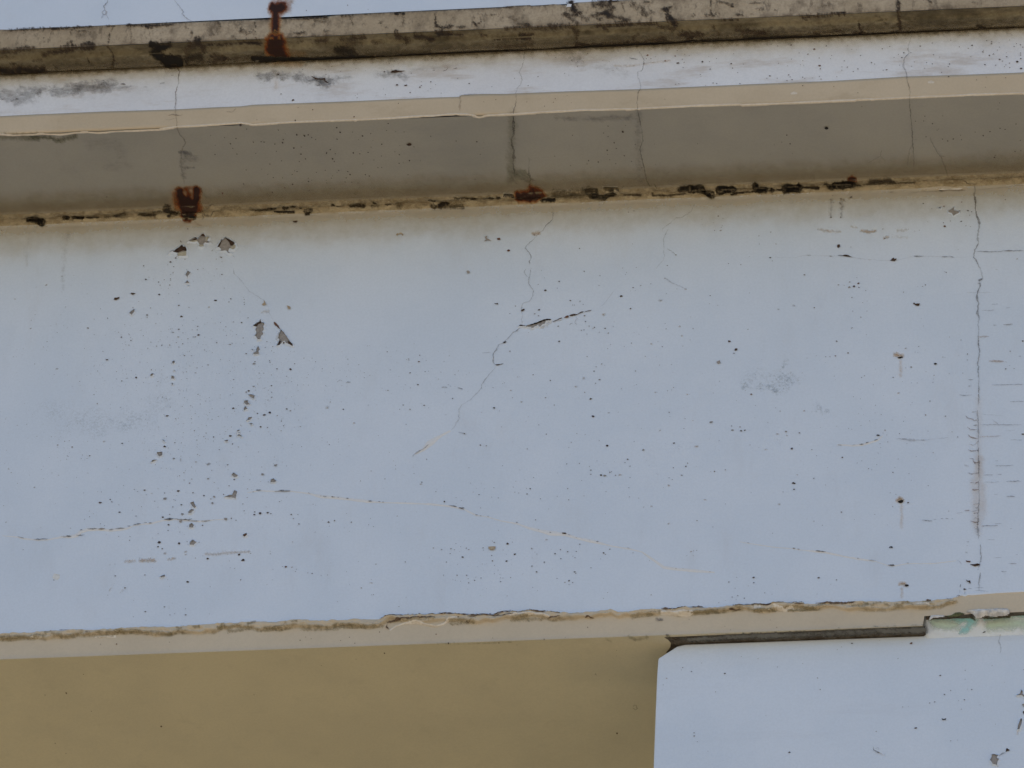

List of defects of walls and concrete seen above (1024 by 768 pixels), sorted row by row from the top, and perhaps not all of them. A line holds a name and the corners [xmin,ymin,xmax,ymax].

corrosion [264,0,289,62]
damp [0,0,1024,75]
corrosion [167,186,212,222]
corrosion [514,185,546,203]
peeling [84,228,296,549]
crack [7,518,227,541]
crack [248,489,715,573]
flaking render [360,609,560,644]
peeling [646,595,944,657]
flaking render [967,608,1009,633]